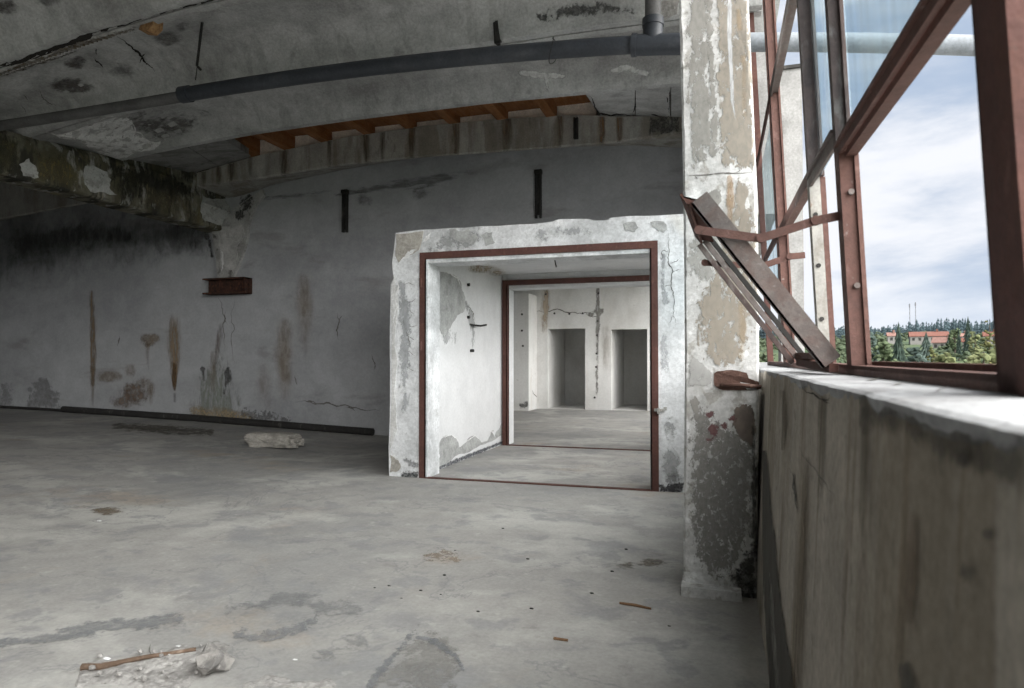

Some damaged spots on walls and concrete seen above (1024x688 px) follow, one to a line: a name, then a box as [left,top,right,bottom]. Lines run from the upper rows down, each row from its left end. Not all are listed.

crack [0,0,214,72]
peeling [46,116,161,159]
peeling [661,0,757,249]
peeling [19,159,39,179]
peeling [83,165,116,195]
flaking render [623,221,667,233]
crack [661,237,679,325]
flaking render [440,272,465,336]
rust [169,323,179,390]
leakage [114,383,145,407]
crack [294,377,376,411]
flaking render [439,424,502,467]